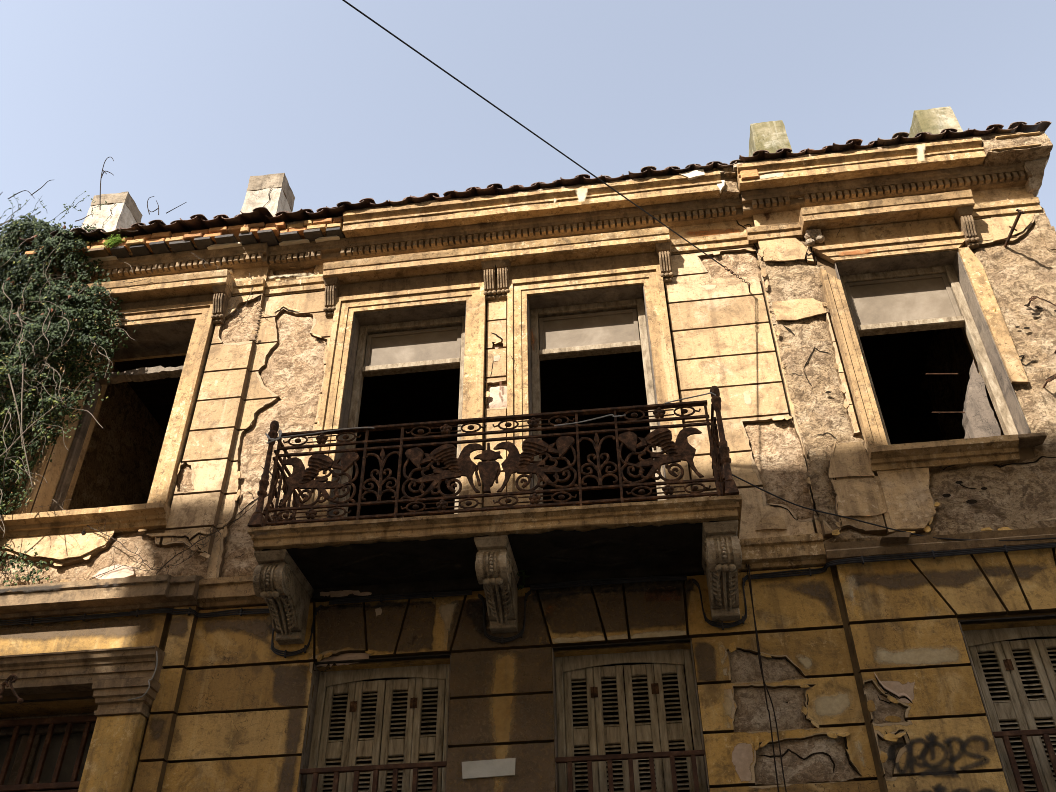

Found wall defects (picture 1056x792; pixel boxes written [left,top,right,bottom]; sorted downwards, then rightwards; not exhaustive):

spalling [0,294,328,587]
spalling [697,235,884,544]
crack [767,432,842,526]
spalling [906,207,1056,537]
leakage [270,665,309,792]
leakage [316,579,694,792]
spalling [721,642,864,789]
spalling [863,679,915,781]
peeling [877,648,958,664]